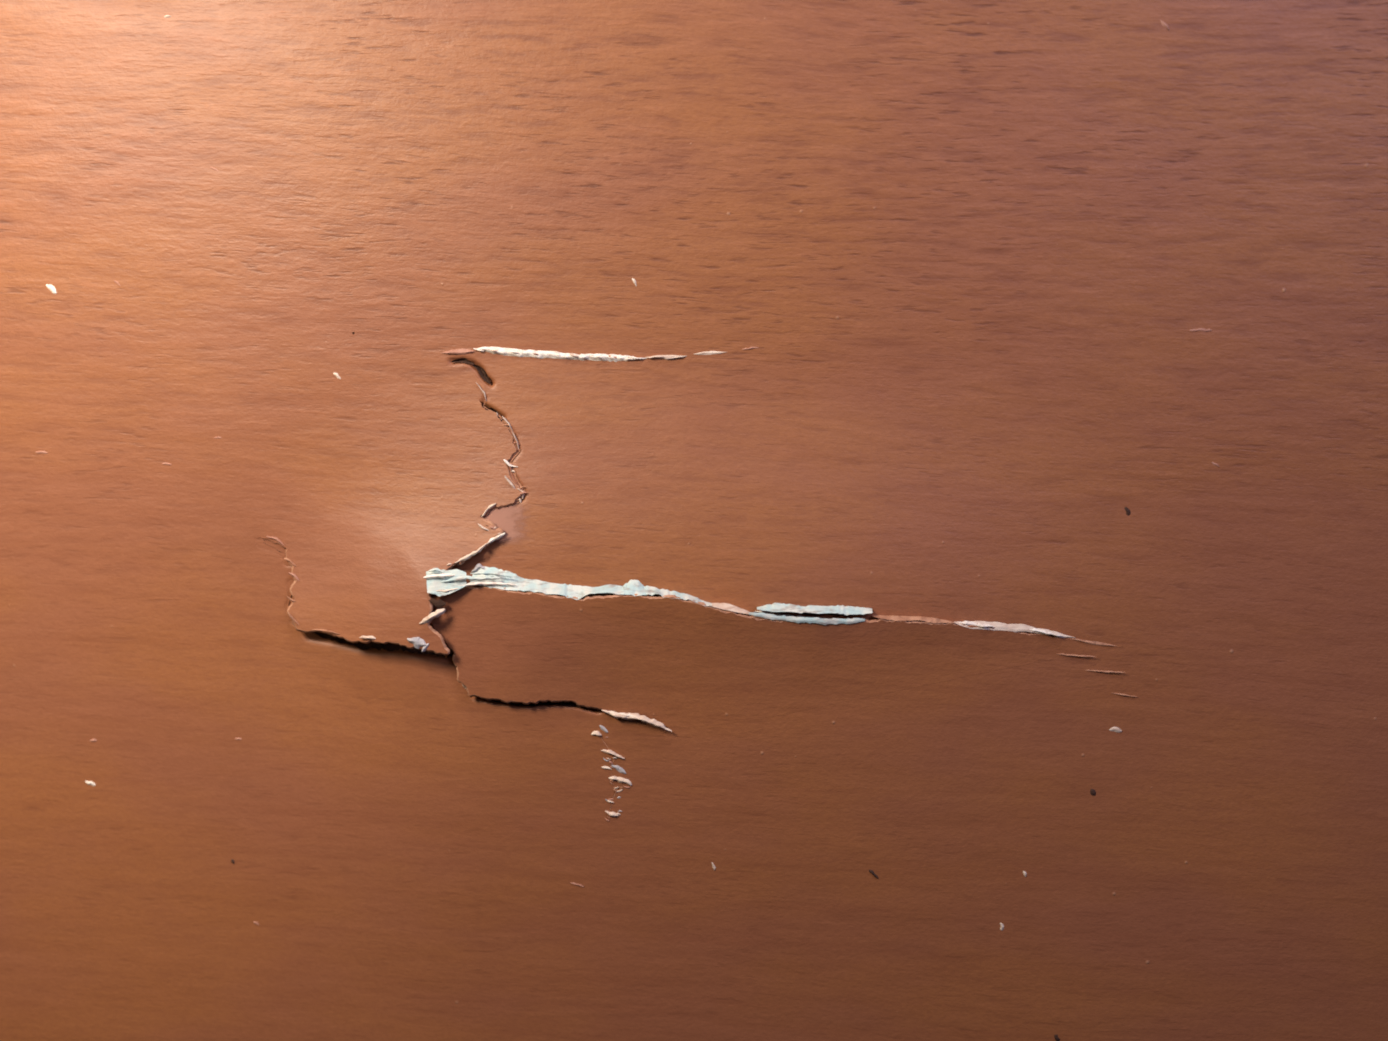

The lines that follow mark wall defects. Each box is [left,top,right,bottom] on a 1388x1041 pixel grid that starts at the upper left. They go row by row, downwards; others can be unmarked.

crack [359,347,1137,732]
spalling [591,725,632,821]